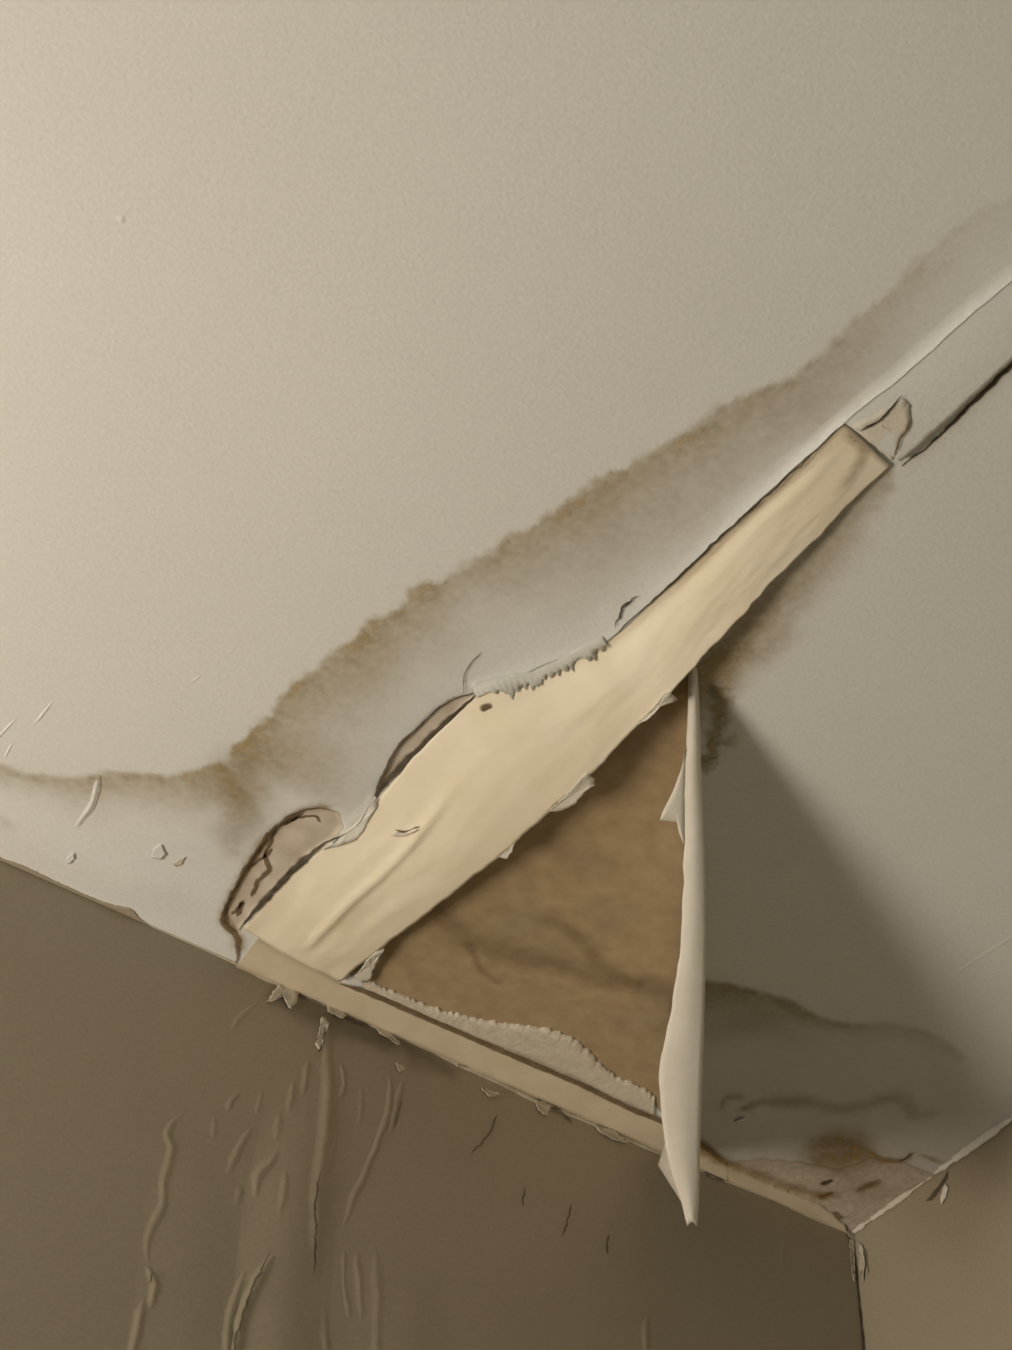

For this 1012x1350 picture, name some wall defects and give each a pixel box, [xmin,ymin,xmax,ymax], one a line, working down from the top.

crack [608,362,1012,642]
damp [232,681,308,761]
damp [343,610,405,661]
spalling [375,652,482,794]
damp [676,623,759,765]
spalling [220,807,343,963]
damp [730,1158,934,1232]